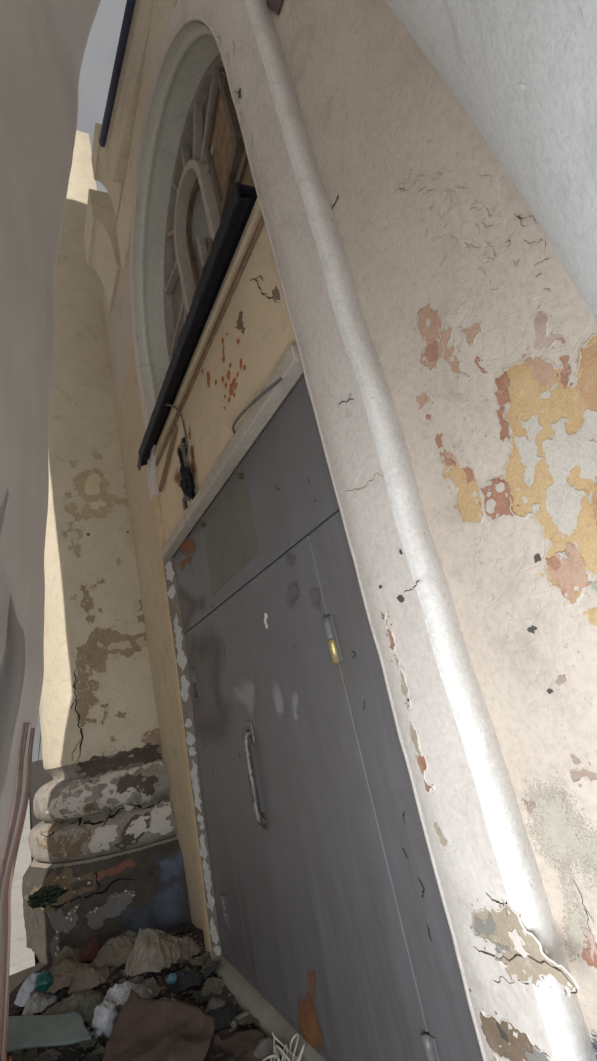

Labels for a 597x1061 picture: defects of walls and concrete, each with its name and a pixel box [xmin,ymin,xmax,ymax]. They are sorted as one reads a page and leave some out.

peeling [62,452,130,559]
peeling [413,303,597,626]
crack [70,670,83,760]
peeling [69,577,148,730]
peeling [173,613,190,702]
peeling [381,611,435,794]
spalling [25,728,188,964]
peeling [185,719,221,956]
peeling [434,823,455,852]
spalling [470,893,579,997]
rust [296,968,323,1053]
spalling [469,989,555,1061]